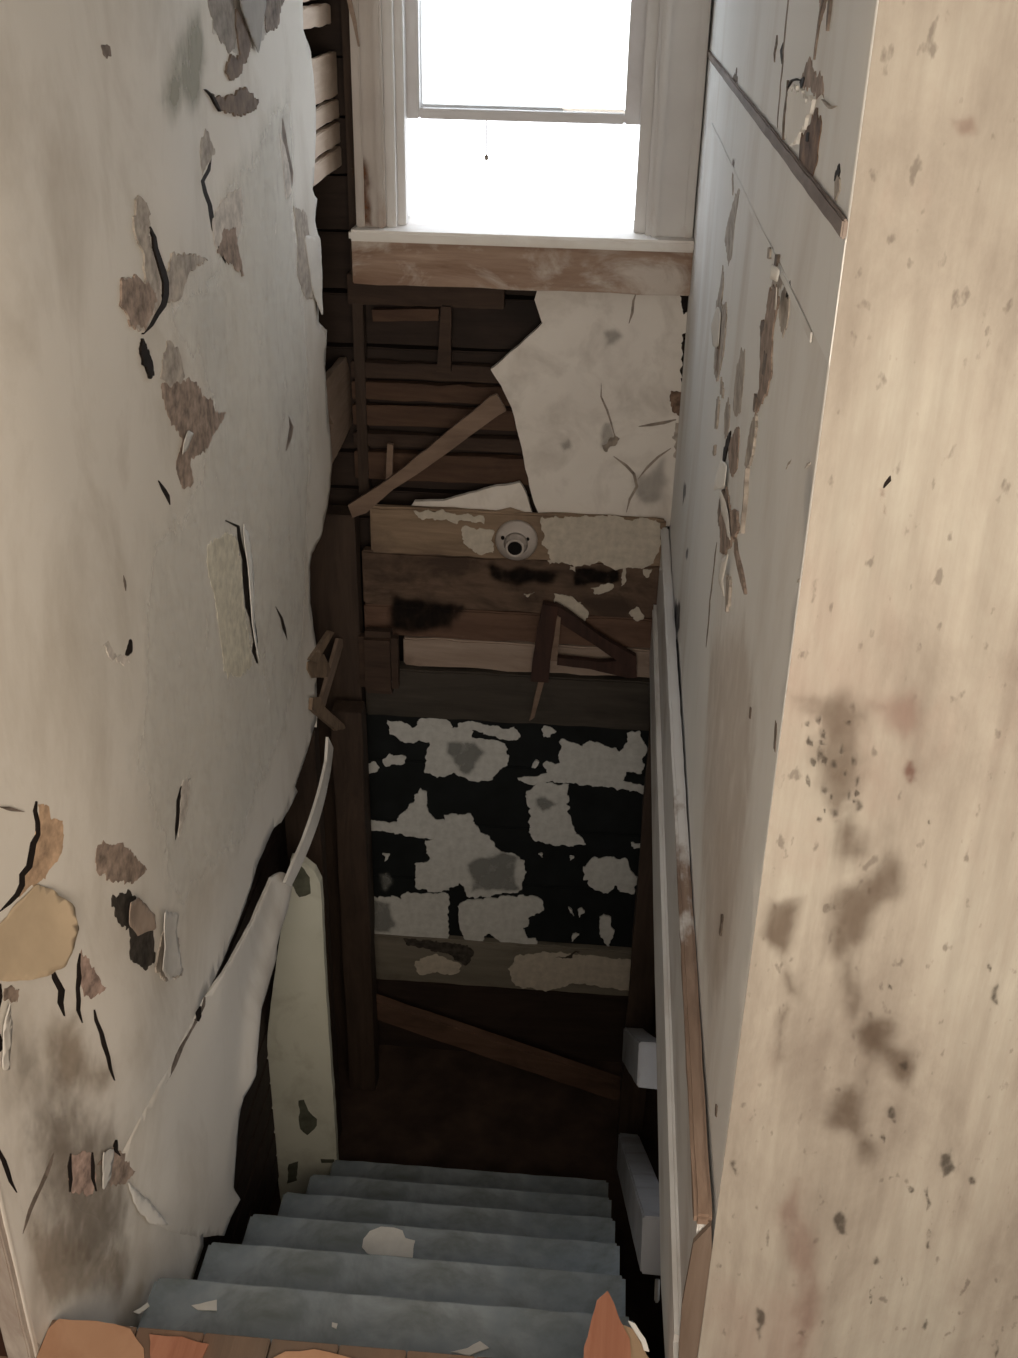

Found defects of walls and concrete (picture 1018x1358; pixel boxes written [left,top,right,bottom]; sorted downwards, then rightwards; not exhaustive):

peeling [203,0,285,117]
spalling [782,0,837,176]
peeling [119,129,245,489]
peeling [710,159,791,612]
crack [206,520,287,678]
peeling [540,514,661,594]
peeling [0,801,115,1081]
peeling [95,840,183,982]
peeling [369,718,648,992]
leakage [768,907,794,948]
leakage [836,869,895,950]
leakage [862,1025,909,1078]